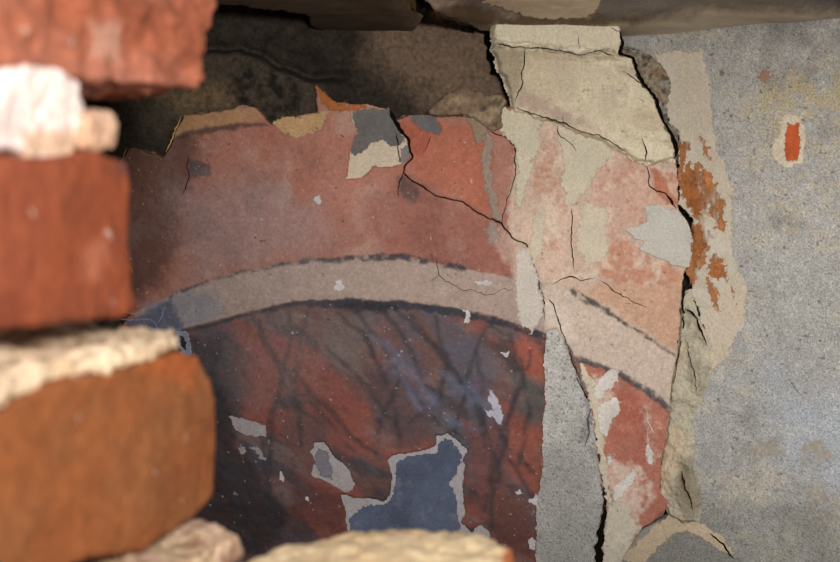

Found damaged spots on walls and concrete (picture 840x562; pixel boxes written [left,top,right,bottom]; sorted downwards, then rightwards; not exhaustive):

flaking render [272,86,411,179]
flaking render [410,115,441,135]
crack [408,0,679,157]
flaking render [482,0,748,374]
damp [439,0,840,26]
crack [642,139,676,208]
rust [677,136,735,312]
crack [389,110,650,562]
flaking render [310,433,491,538]
flaking render [515,329,637,562]